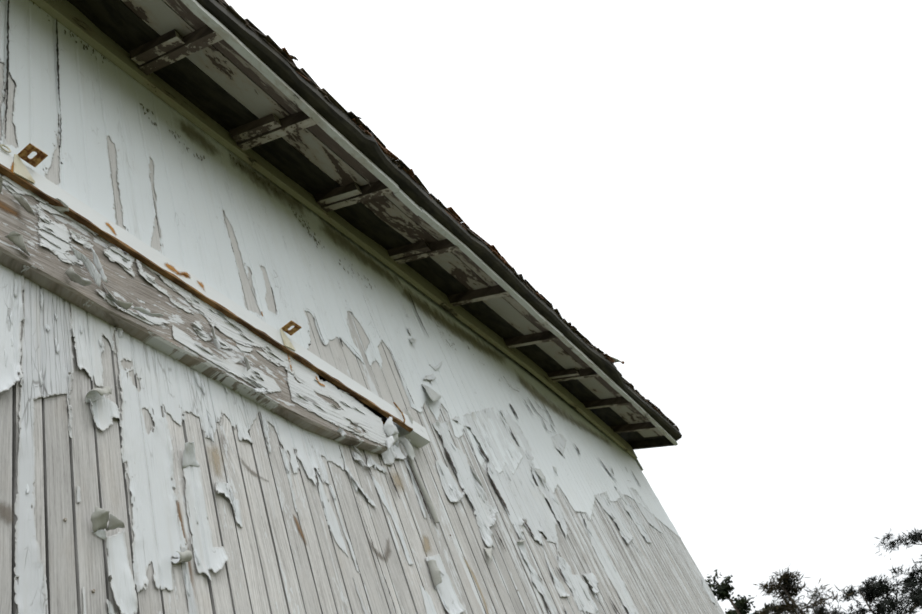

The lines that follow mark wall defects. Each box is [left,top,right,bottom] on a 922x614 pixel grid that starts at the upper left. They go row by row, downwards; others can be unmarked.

peeling [45,136,60,184]
peeling [107,136,123,228]
peeling [149,159,160,251]
peeling [0,175,442,614]
peeling [432,408,636,614]
peeling [419,554,466,614]